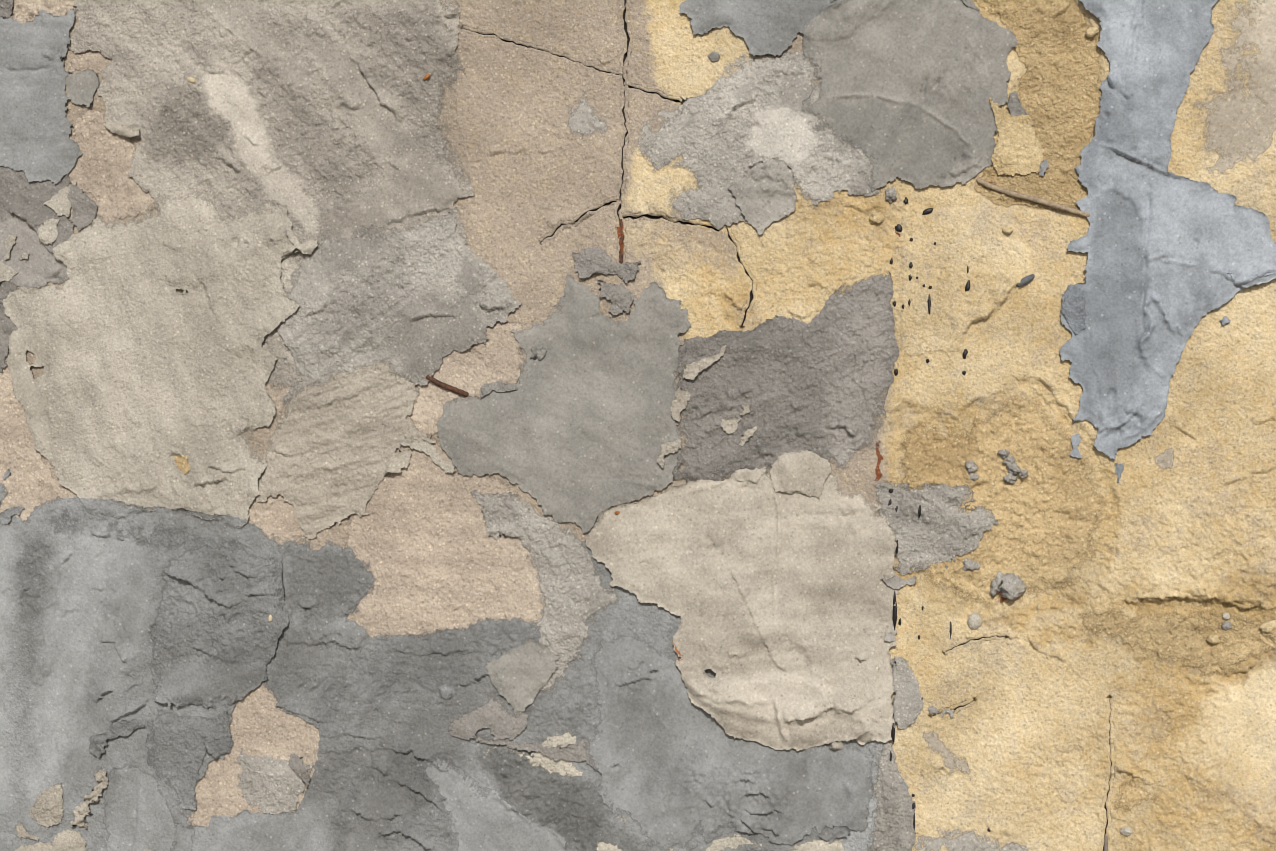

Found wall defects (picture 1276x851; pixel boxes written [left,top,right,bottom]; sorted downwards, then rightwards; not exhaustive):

peeling [38,110,155,245]
crack [461,0,757,326]
spalling [962,0,1102,211]
peeling [0,356,78,522]
peeling [248,494,305,545]
peeling [342,322,546,638]
peeling [734,450,831,499]
spalling [880,395,1110,608]
peeling [187,682,320,827]
peeling [513,732,583,777]
peeling [706,834,764,851]
peeling [793,839,845,851]